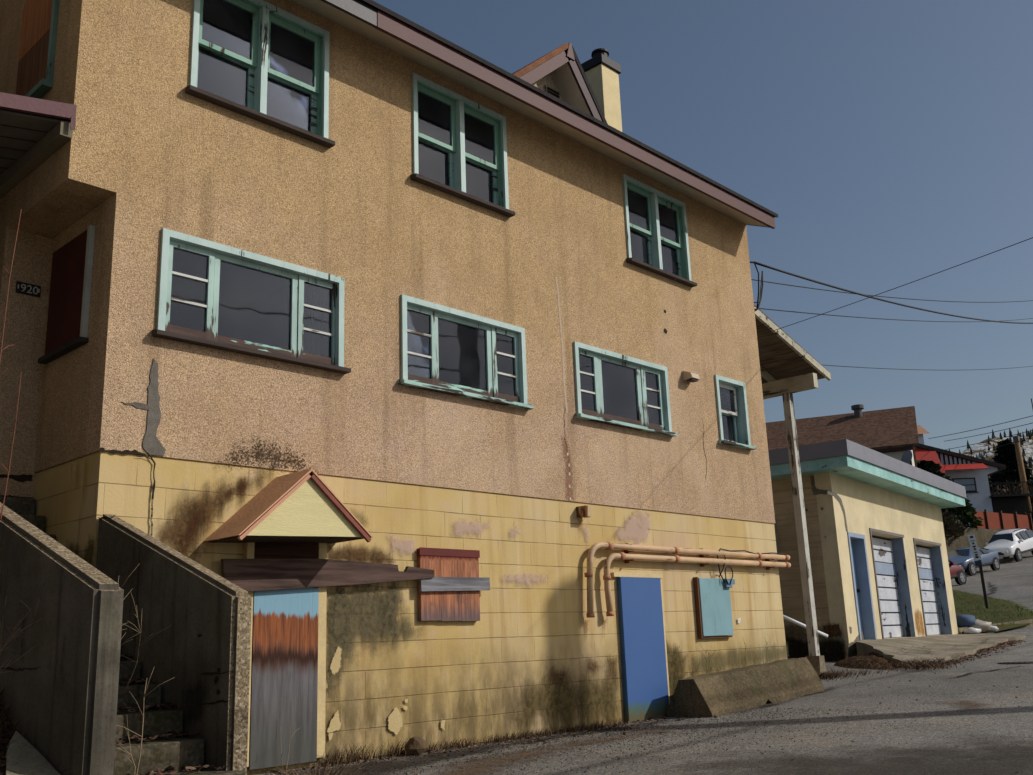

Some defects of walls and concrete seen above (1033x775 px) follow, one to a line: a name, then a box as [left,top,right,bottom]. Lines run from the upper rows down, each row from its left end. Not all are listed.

crack [100,447,156,536]
mould [160,436,316,559]
peeling [326,646,342,688]
leakage [326,584,418,697]
peeling [327,710,341,741]
peeling [388,699,408,735]